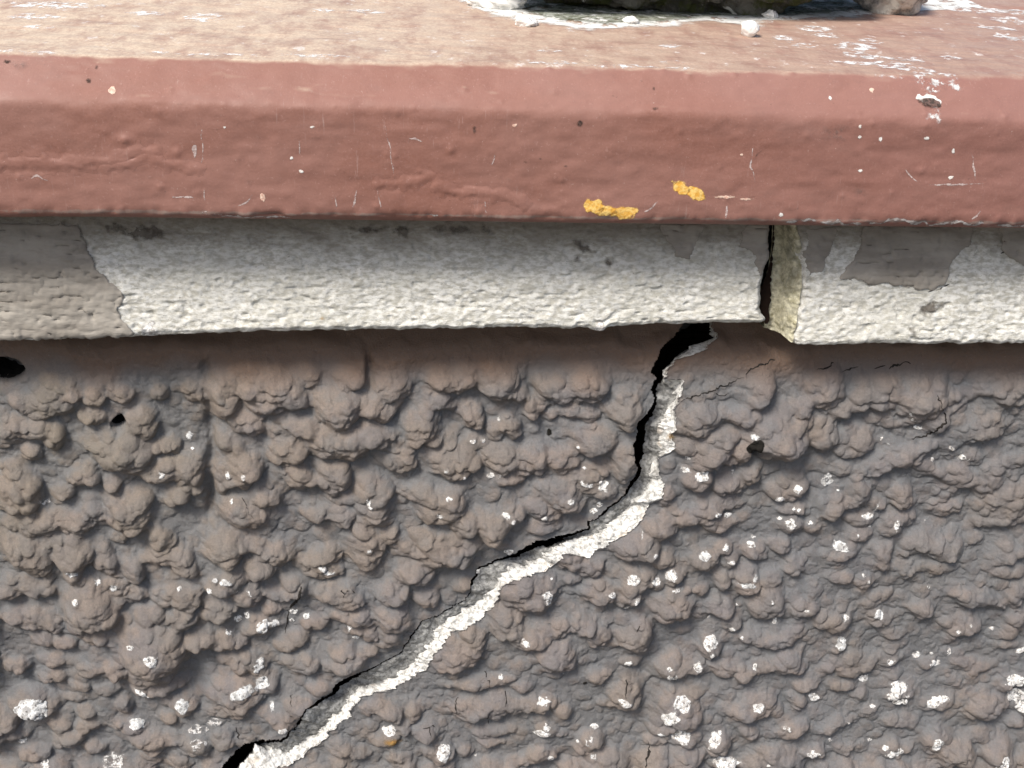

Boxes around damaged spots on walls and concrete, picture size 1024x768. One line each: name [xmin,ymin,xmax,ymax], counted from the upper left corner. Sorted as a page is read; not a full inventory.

peeling [660,224,704,260]
peeling [739,225,769,276]
peeling [779,213,984,291]
peeling [997,224,1024,266]
crack [222,225,802,768]